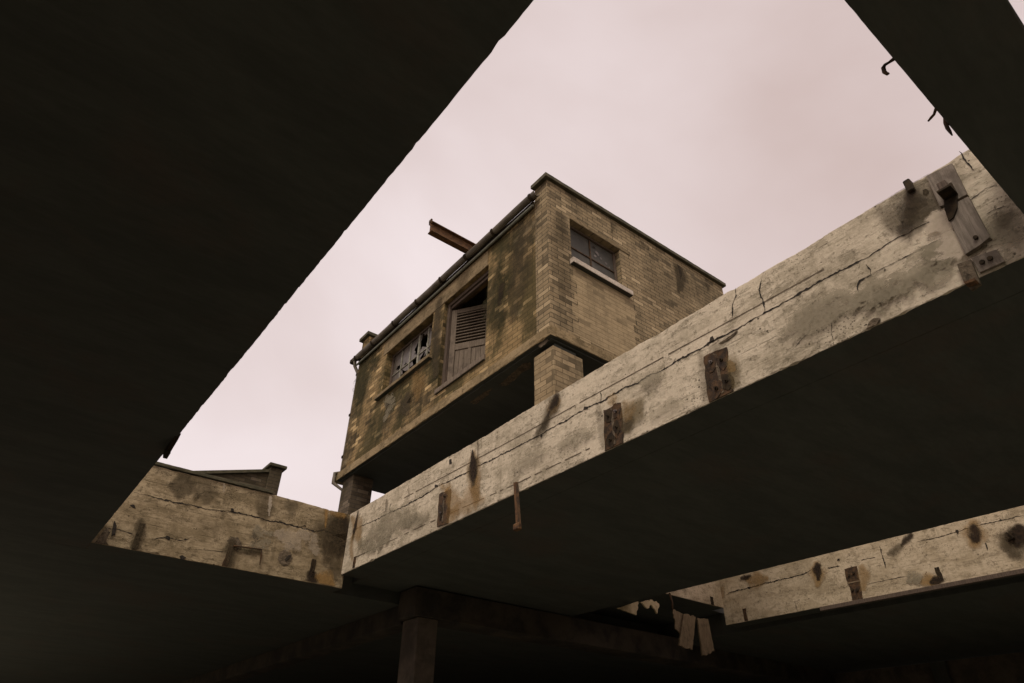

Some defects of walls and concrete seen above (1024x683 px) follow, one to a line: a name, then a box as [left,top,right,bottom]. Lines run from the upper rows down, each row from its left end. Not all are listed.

damp [898,191,920,236]
crack [351,222,942,533]
rust [705,350,736,390]
damp [540,394,559,430]
rust [605,399,643,449]
crack [134,492,323,532]
damp [1000,523,1024,558]